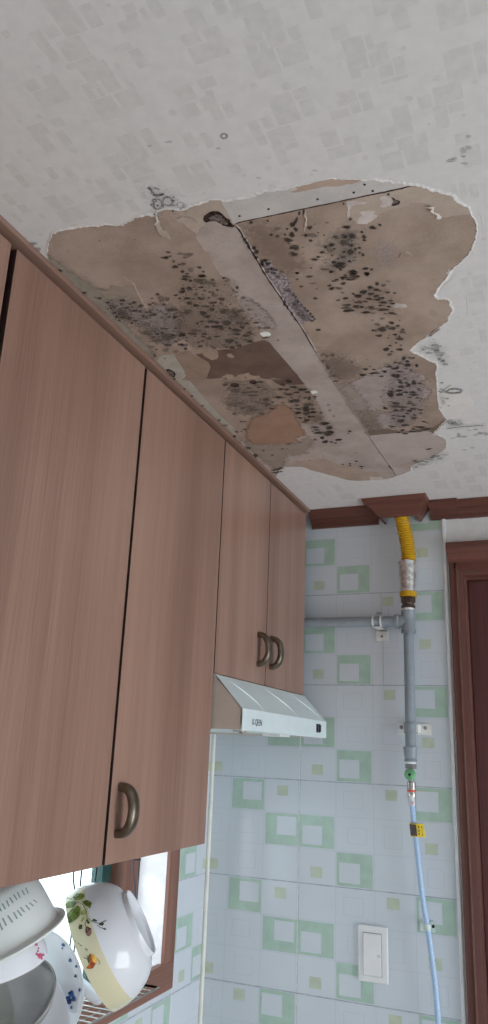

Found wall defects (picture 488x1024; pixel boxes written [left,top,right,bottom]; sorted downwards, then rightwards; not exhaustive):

leakage [147,187,175,215]
leakage [82,251,351,457]
spalling [259,259,316,325]
leakage [270,210,446,435]